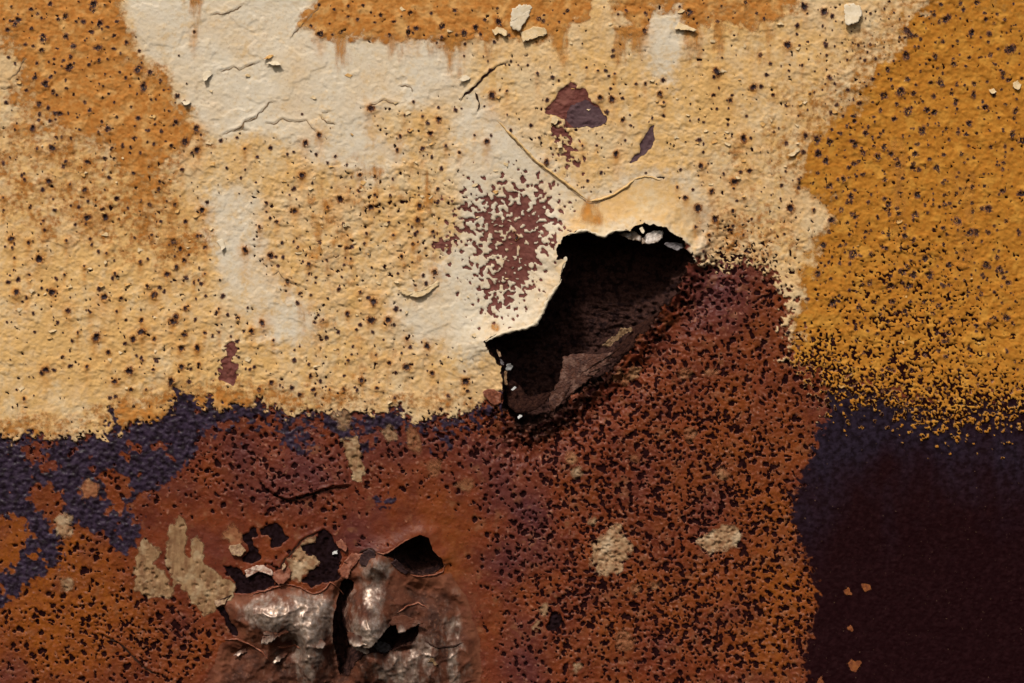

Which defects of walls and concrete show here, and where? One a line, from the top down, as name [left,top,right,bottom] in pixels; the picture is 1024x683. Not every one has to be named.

corrosion [297,0,592,67]
peeling [430,1,587,107]
corrosion [0,0,212,262]
crack [224,102,335,134]
crack [461,62,661,204]
peeling [613,116,655,163]
corrosion [717,214,783,261]
corrosion [771,0,1024,455]
corrosion [0,381,353,440]